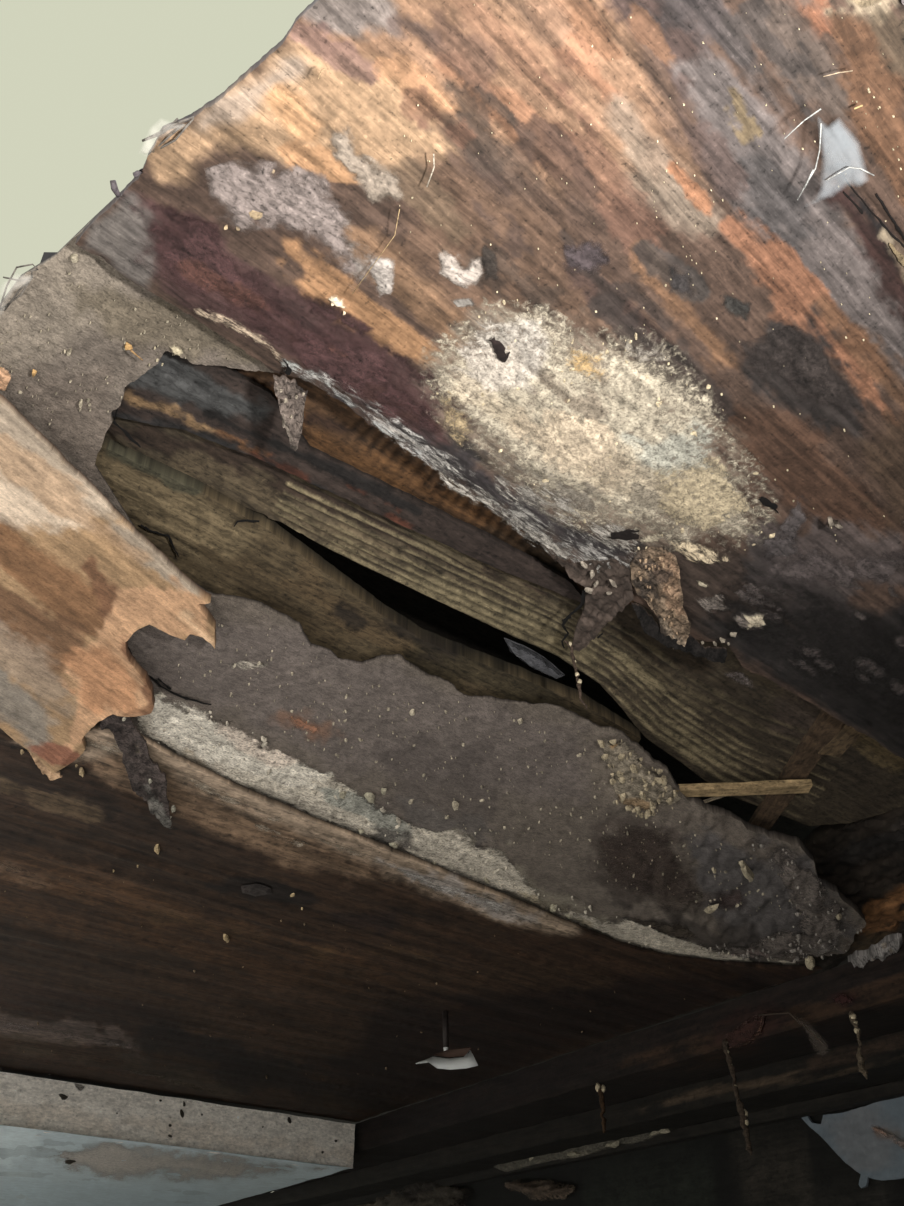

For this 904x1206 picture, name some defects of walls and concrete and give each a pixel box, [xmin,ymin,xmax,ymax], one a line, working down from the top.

water stain [331,132,402,201]
crack [844,181,904,247]
peeling [0,367,11,391]
peeling [273,374,308,451]
spalling [489,337,510,362]
water stain [146,162,904,726]
spalling [759,496,779,513]
peeling [551,529,737,652]
peeling [20,750,63,780]
spalling [99,692,862,970]